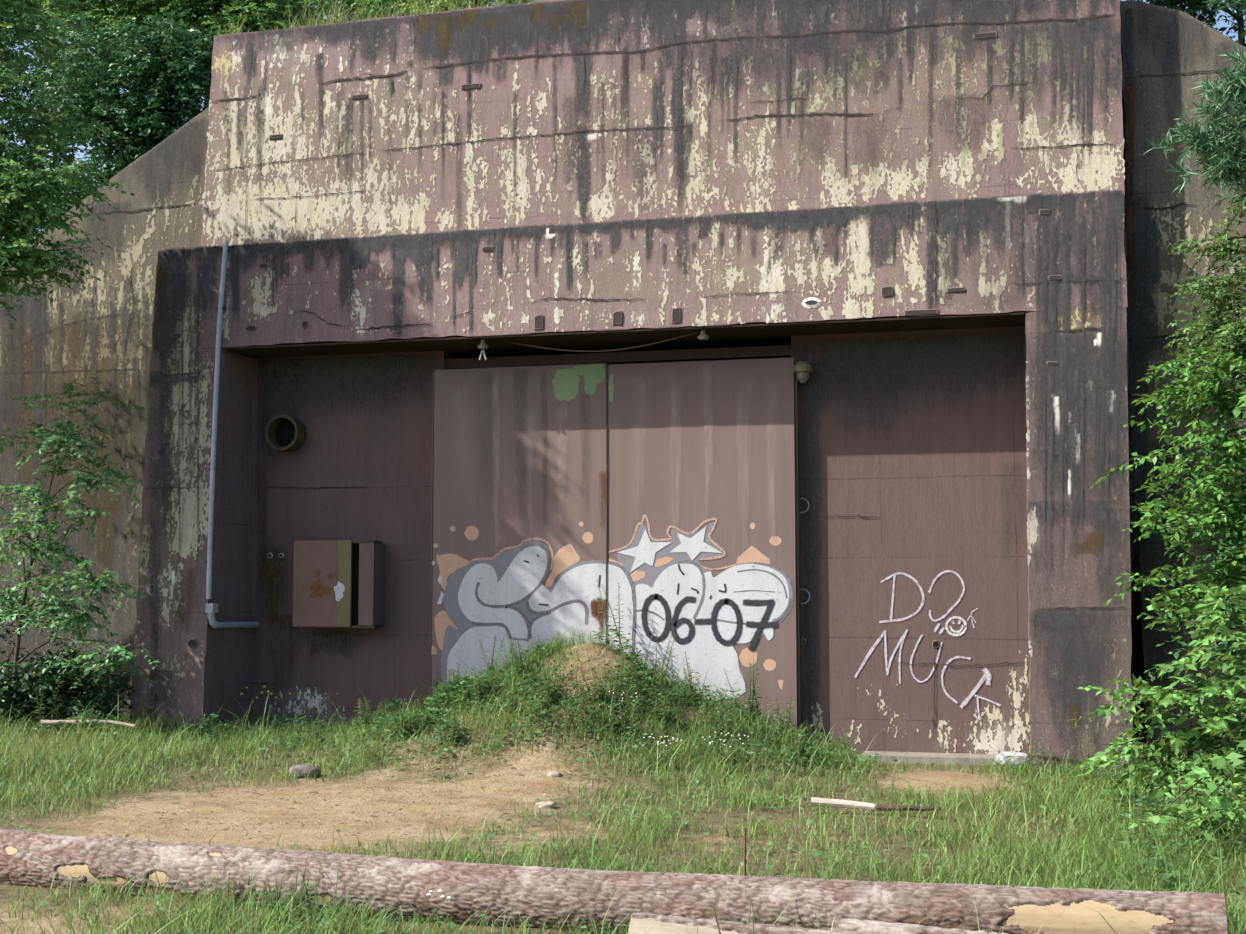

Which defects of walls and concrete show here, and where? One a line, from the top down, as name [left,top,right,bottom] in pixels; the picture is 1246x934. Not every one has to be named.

crack [214,50,266,102]
crack [209,125,687,233]
crack [319,14,1117,101]
crack [727,98,900,121]
crack [1017,143,1118,176]
peeling [0,0,1128,643]
damp [0,0,1236,720]
peeling [1136,201,1242,336]
rust [591,597,607,632]
peeling [270,686,346,725]
peeling [857,640,1033,754]
damp [1036,609,1113,745]